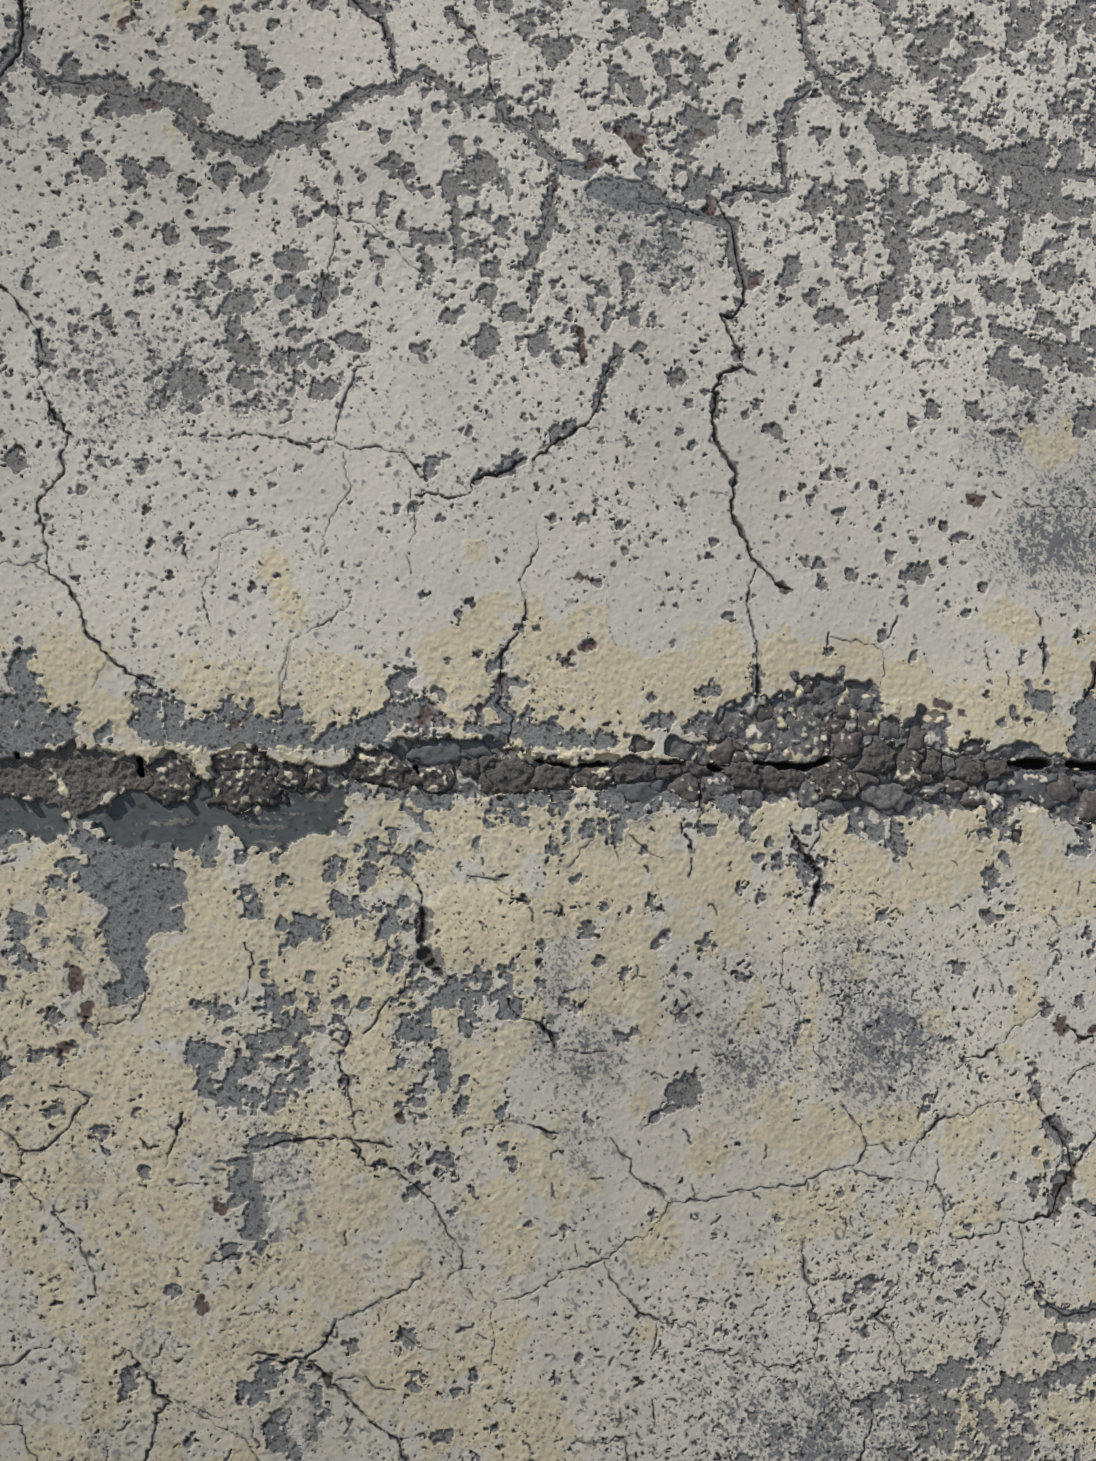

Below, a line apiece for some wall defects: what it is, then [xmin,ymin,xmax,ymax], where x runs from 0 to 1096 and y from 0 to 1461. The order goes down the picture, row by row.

peeling [0,0,1096,447]
crack [639,0,1096,705]
crack [0,284,158,691]
crack [211,356,620,576]
peeling [780,469,895,510]
peeling [795,521,975,592]
crack [565,756,832,879]
crack [1007,758,1096,772]
spalling [0,637,1096,1265]
crack [246,813,1096,1461]
peeling [843,1271,897,1340]
peeling [839,1283,1096,1461]